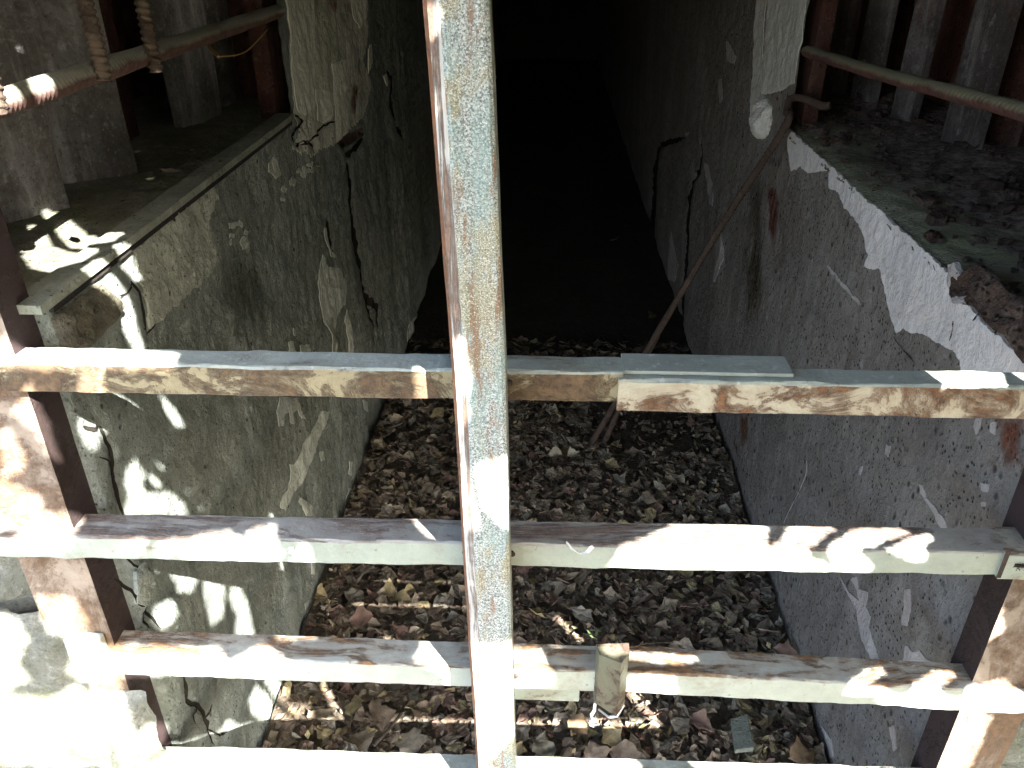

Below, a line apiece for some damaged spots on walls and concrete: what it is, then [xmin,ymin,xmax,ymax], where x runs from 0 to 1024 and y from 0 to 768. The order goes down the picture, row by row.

peeling [750,0,807,113]
crack [291,114,335,166]
peeling [318,228,354,353]
crack [326,137,378,331]
crack [650,137,703,319]
peeling [787,132,1024,373]
crack [83,425,124,515]
peeling [276,396,330,516]
peeling [840,577,880,659]
crack [183,676,227,746]